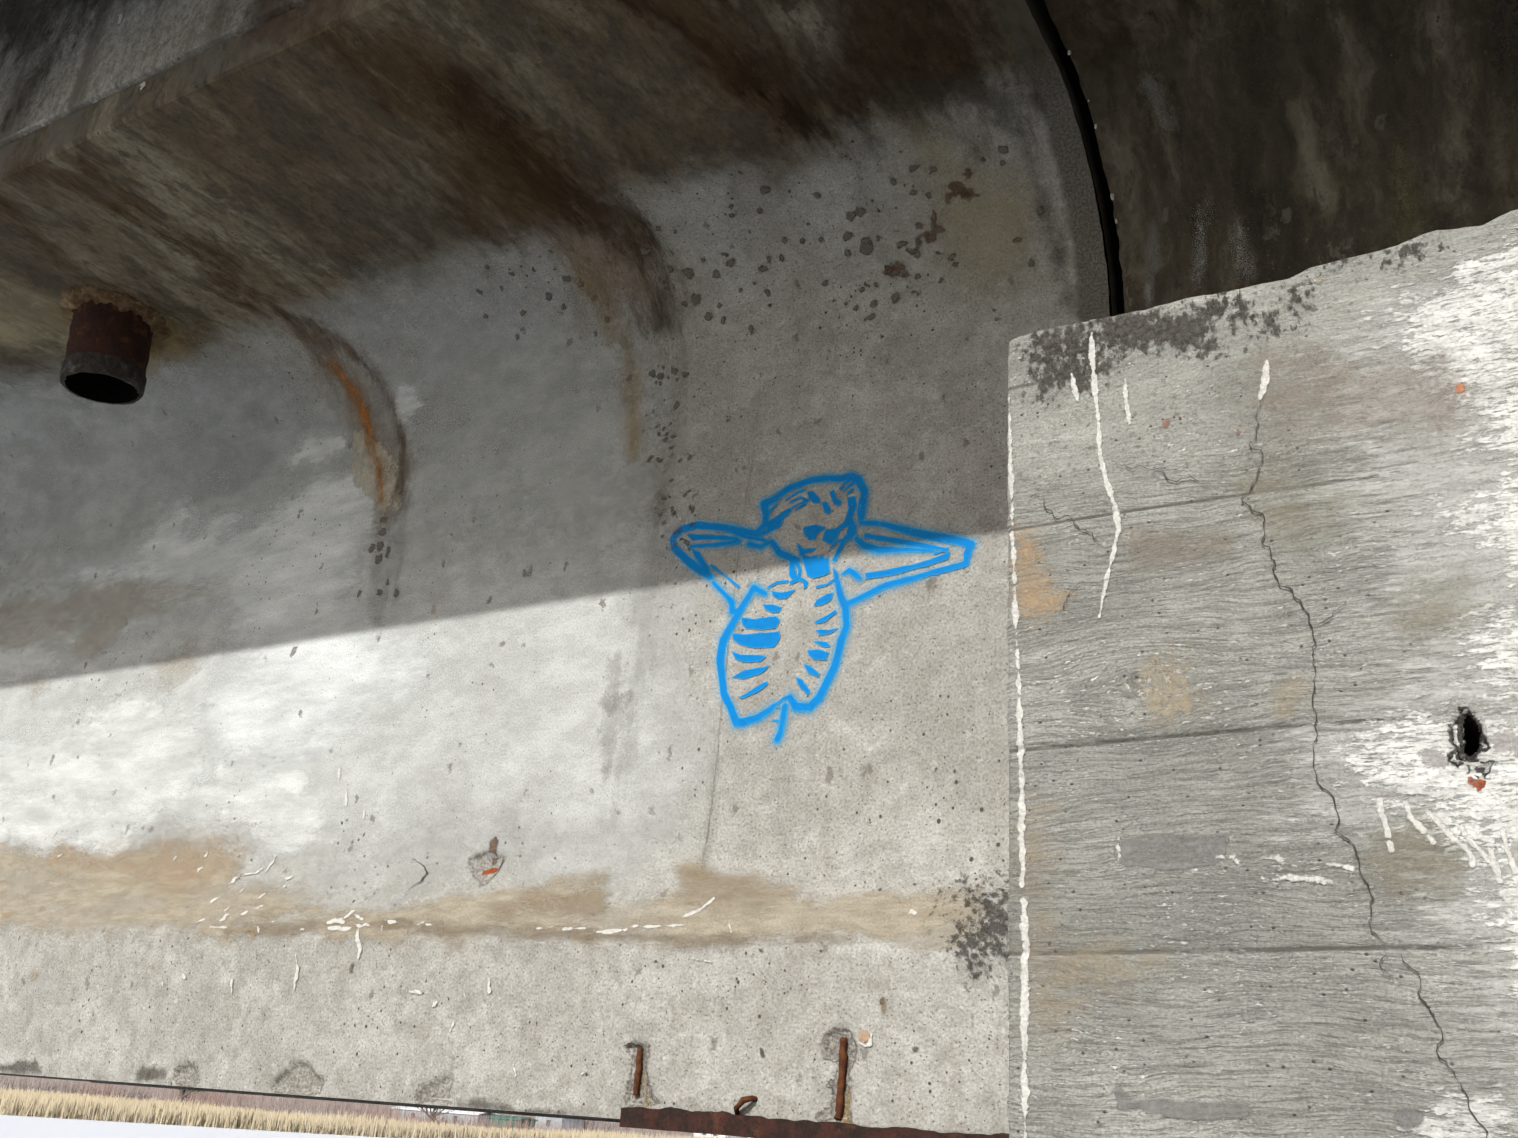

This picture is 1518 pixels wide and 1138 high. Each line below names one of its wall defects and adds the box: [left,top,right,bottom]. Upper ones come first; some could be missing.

corrosion [274,308,405,513]
crack [1111,461,1207,486]
peeling [1257,212,1518,1138]
crack [1241,397,1488,1138]
spalling [468,837,504,887]
peeling [1114,834,1240,870]
leakage [928,870,1009,986]
peeling [1113,1087,1250,1120]